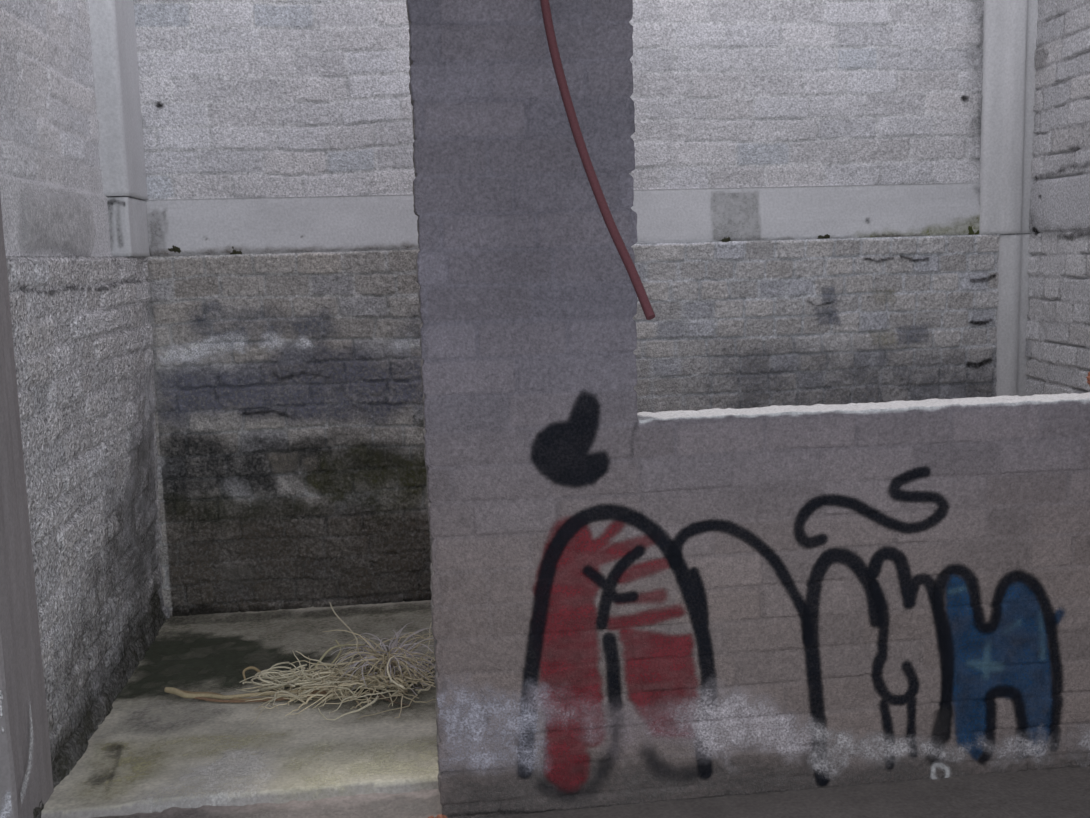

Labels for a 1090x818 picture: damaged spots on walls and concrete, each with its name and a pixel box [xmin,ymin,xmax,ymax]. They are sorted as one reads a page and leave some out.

damp [108,304,423,631]